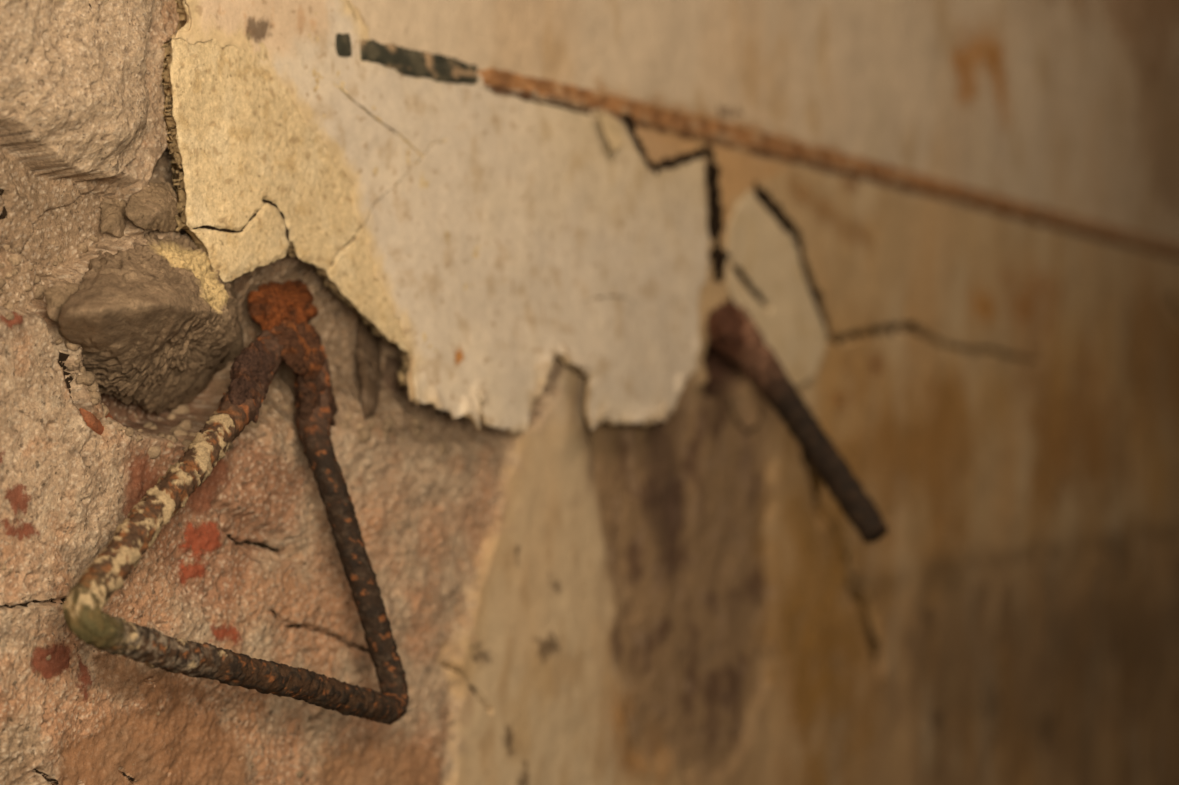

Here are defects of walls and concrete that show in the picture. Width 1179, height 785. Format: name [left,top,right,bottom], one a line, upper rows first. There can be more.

corrosion [228,279,338,438]
flaking render [0,0,775,785]
crack [481,86,768,308]
corrosion [707,300,754,358]
flaking render [726,190,827,388]
crack [754,181,1037,366]
crack [0,598,67,608]
crack [34,769,59,785]